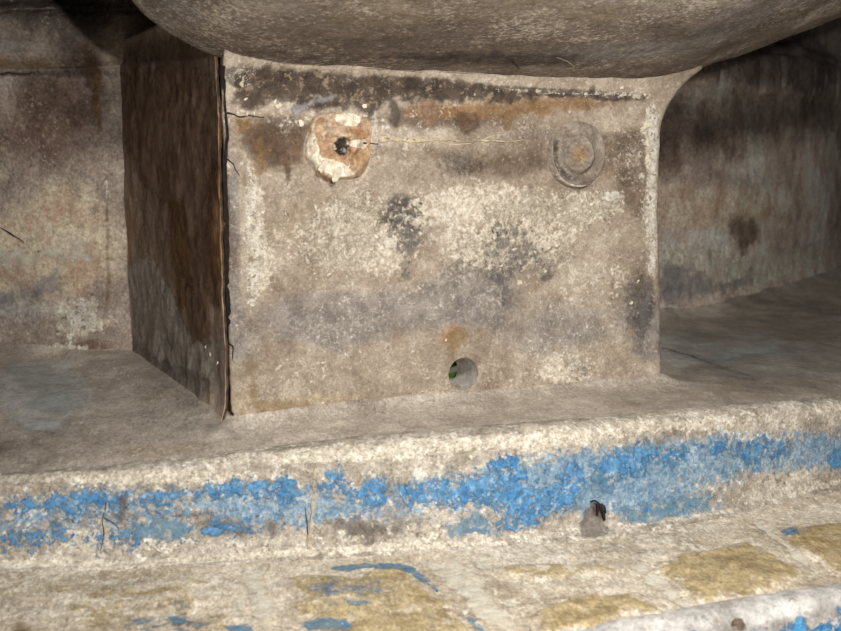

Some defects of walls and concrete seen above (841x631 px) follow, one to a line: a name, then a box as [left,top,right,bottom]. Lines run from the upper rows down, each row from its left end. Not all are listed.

crack [0,69,32,77]
damp [234,65,602,126]
corrosion [455,100,535,134]
corrosion [239,121,303,179]
damp [639,96,837,306]
peeling [0,474,303,558]
peeling [318,463,410,547]
peeling [399,433,789,539]
peeling [331,563,438,592]
peeling [302,617,352,630]
spalling [731,618,755,630]
peeling [780,606,841,631]